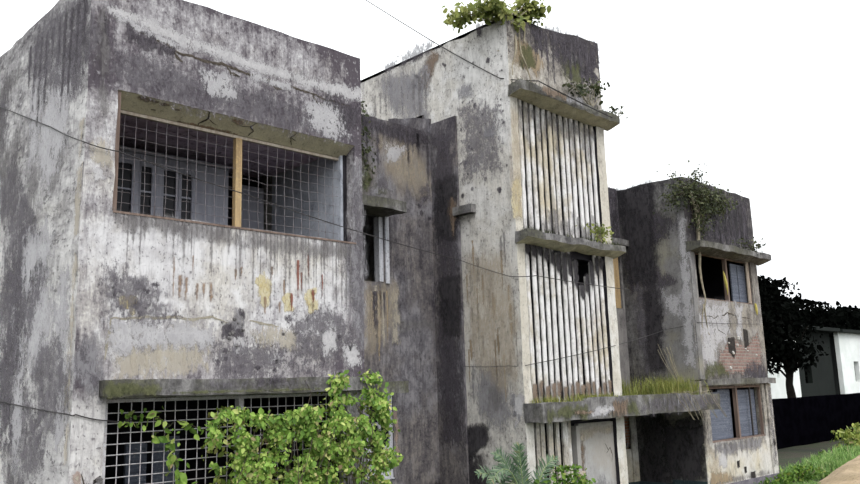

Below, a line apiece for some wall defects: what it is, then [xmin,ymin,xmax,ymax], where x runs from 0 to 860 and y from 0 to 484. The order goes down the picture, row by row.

crack [114,18,350,107]
leakage [514,22,600,100]
leakage [497,177,522,218]
leakage [0,0,518,484]
corrosion [173,261,213,301]
corrosion [279,255,323,311]
leakage [532,245,604,300]
leakage [608,180,750,380]
crack [703,312,752,335]
peeling [699,298,762,376]
peeling [73,471,103,484]